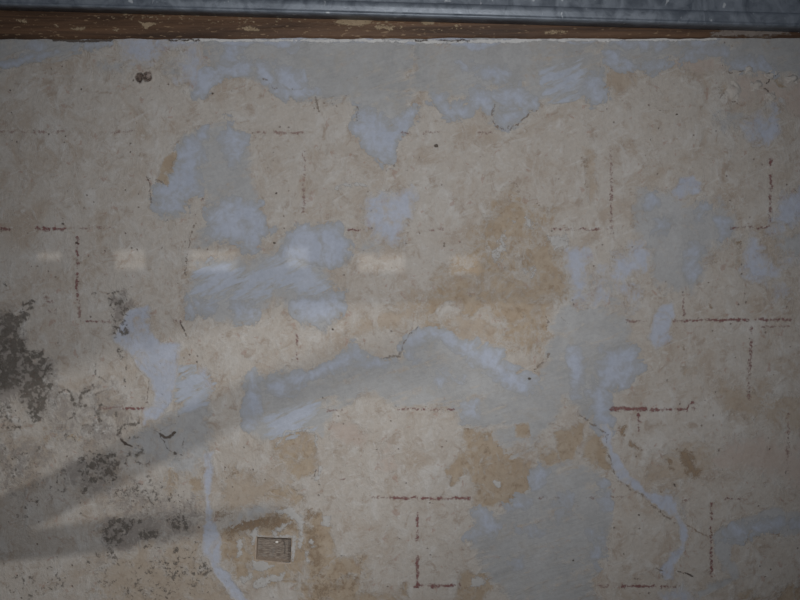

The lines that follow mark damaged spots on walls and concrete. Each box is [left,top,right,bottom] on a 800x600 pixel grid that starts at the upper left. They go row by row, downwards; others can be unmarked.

leakage [107,288,137,336]
leakage [0,299,410,600]